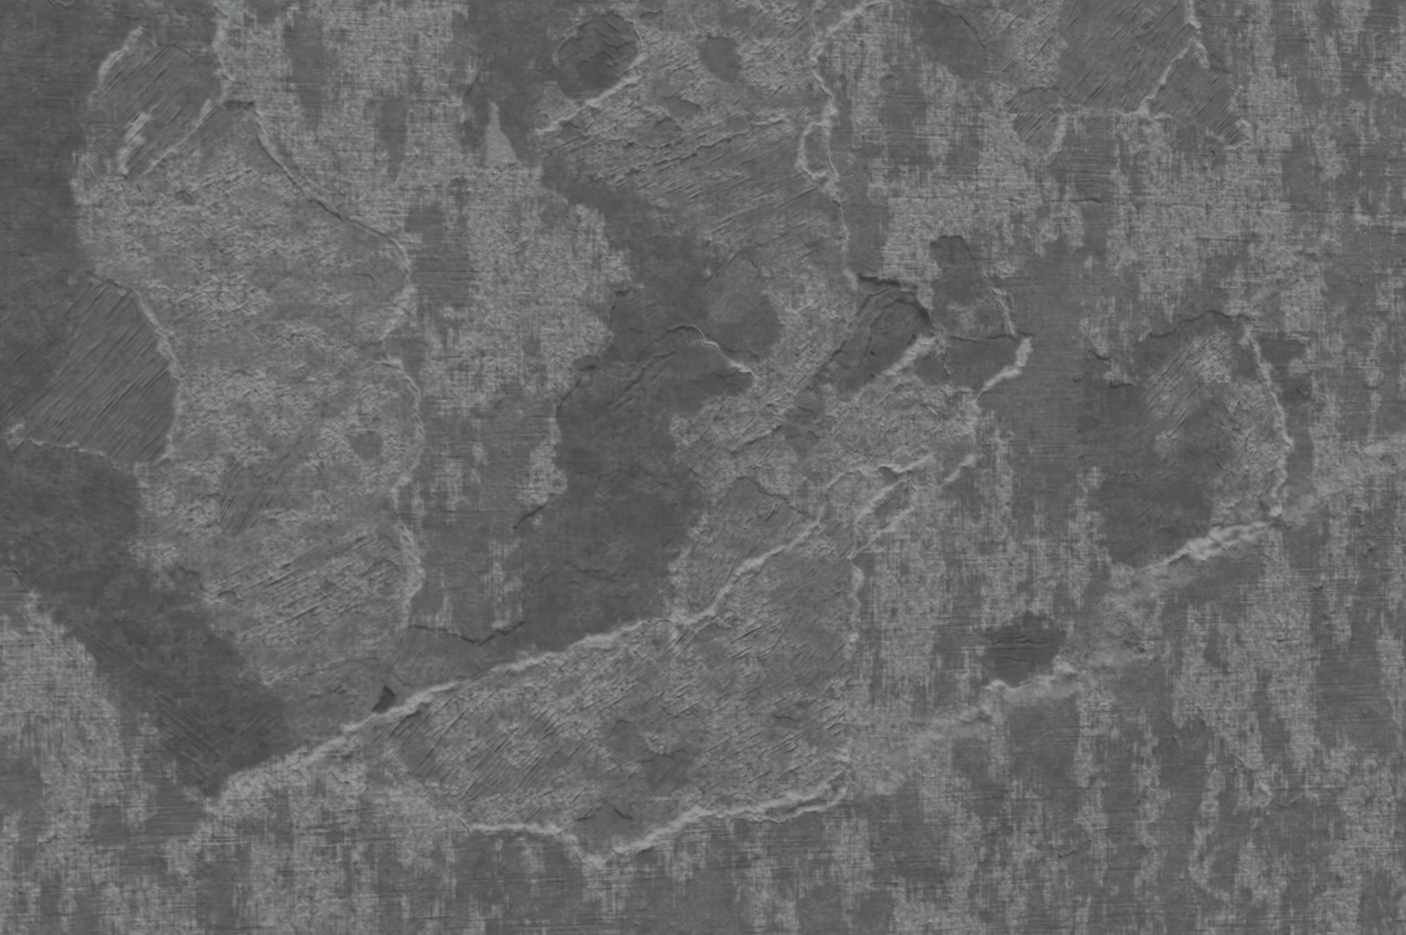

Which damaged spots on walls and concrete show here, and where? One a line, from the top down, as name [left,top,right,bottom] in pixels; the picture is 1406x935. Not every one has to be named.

peeling [903,0,1065,104]
peeling [0,0,1033,912]
peeling [1074,312,1314,572]
peeling [983,613,1066,689]